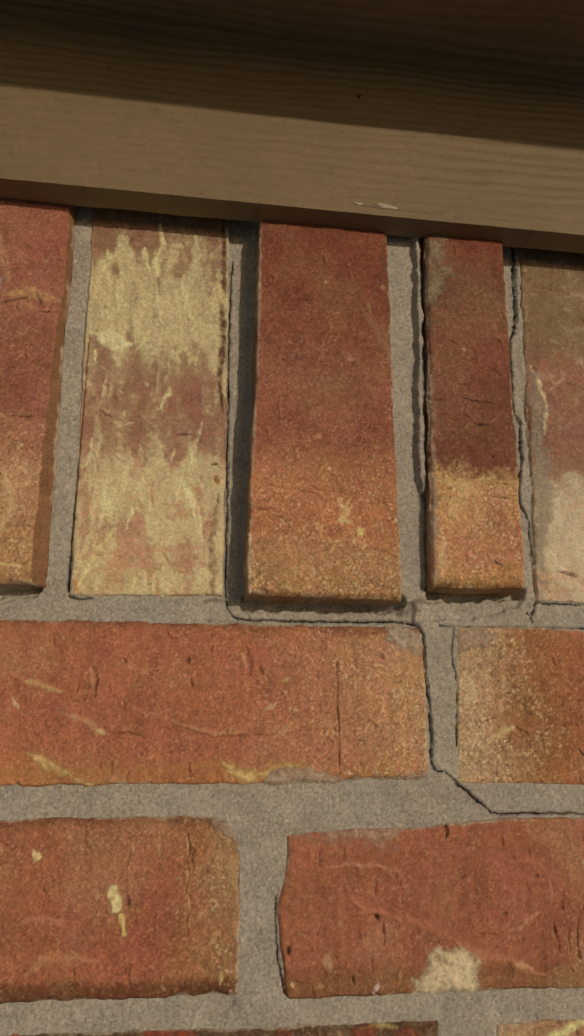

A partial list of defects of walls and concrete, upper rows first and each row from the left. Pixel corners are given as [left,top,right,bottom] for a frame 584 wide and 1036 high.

crack [223,247,584,818]